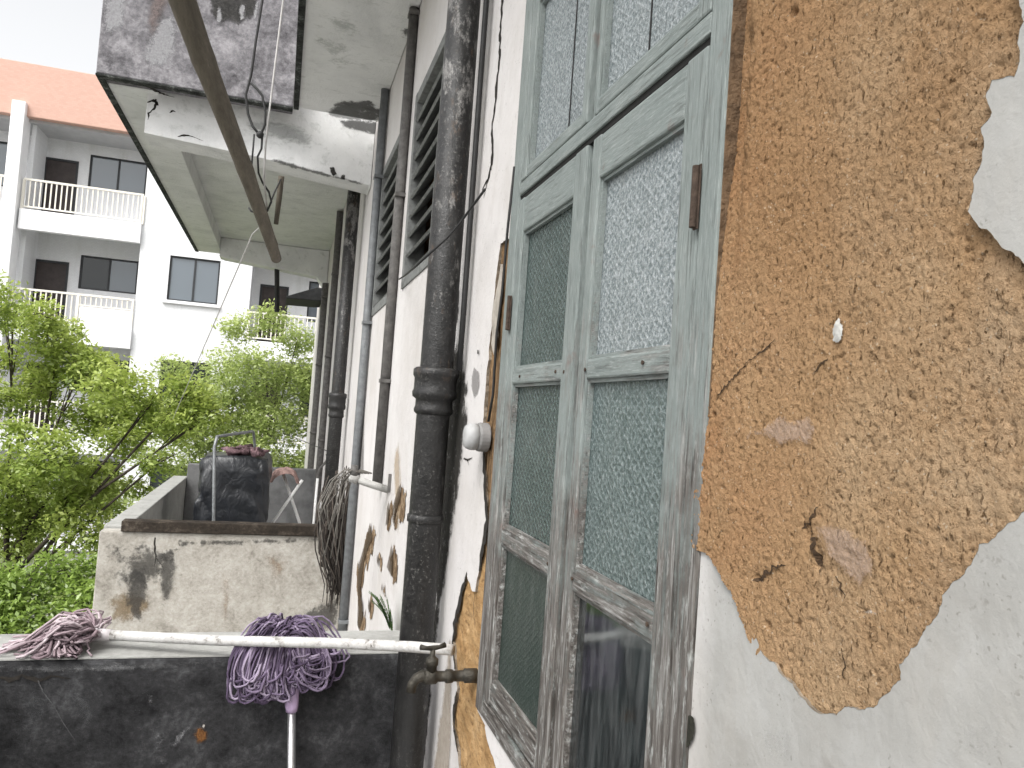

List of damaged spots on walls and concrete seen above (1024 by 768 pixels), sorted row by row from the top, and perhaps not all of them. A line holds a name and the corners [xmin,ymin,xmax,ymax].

water stain [329,100,379,134]
flaking render [691,0,1024,715]
water stain [114,539,296,619]
flaking render [356,485,406,631]
flaking render [452,239,509,768]